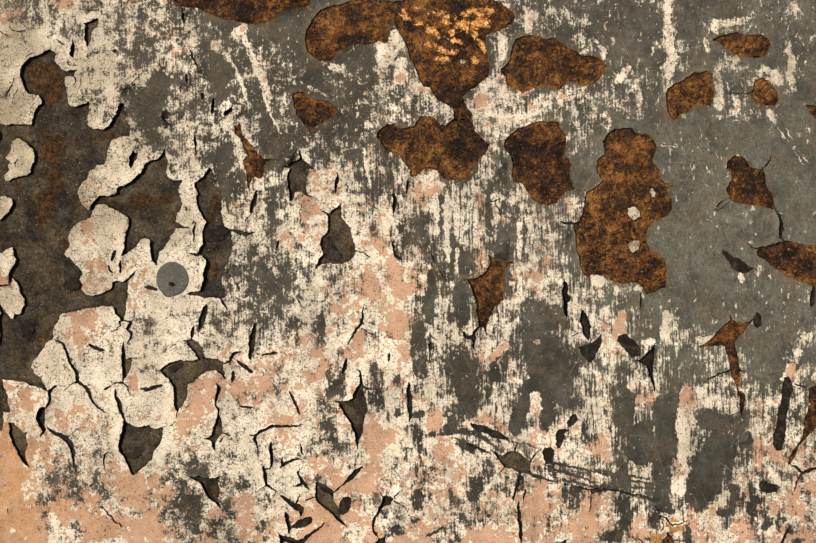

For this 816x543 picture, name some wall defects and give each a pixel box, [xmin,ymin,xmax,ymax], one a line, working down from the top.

peeling [84,18,98,47]
rust [305,0,515,180]
rust [501,35,607,93]
peeling [0,49,190,475]
peeling [186,168,255,298]
rust [504,121,575,206]
rust [573,128,673,294]
peeling [159,339,226,451]
crack [405,382,413,422]
crack [219,391,350,543]
crack [371,487,420,539]
crack [467,422,540,543]